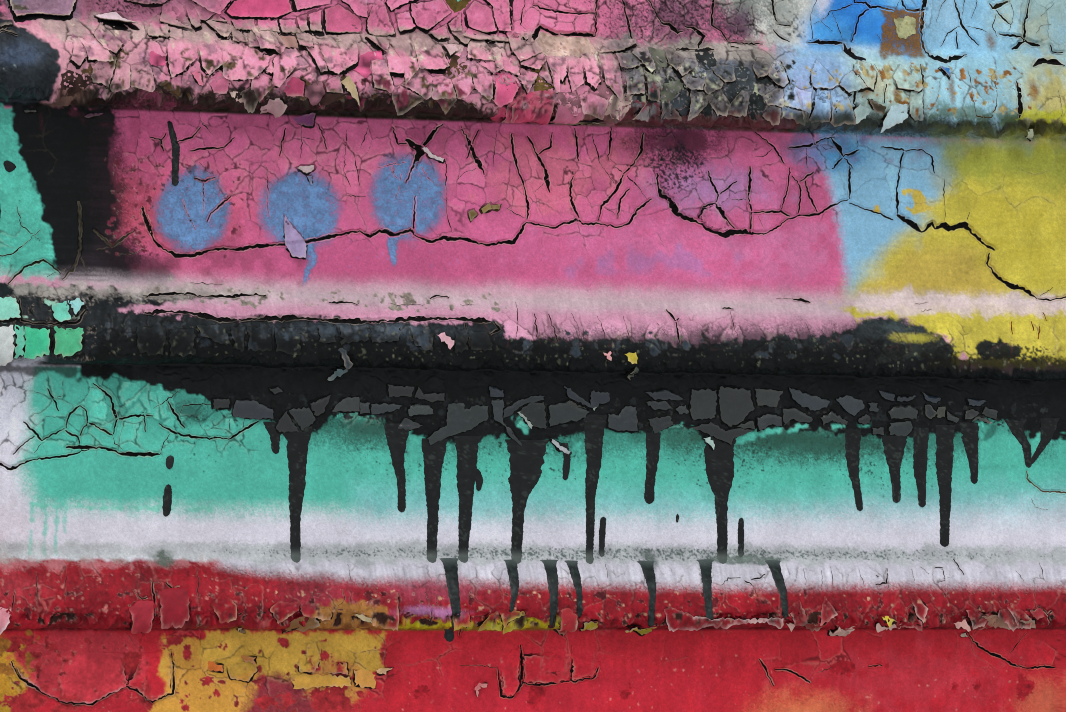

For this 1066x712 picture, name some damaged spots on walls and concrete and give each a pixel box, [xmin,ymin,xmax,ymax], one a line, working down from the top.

peeling [7,0,78,23]
peeling [60,0,924,133]
crack [0,0,1066,349]
peeling [0,294,87,366]
peeling [210,324,998,455]
crack [0,382,260,472]
peeling [0,606,13,635]
peeling [625,594,856,636]
peeling [874,592,929,632]
peeling [953,601,1046,638]
peeling [13,649,174,704]
peeling [291,654,394,689]